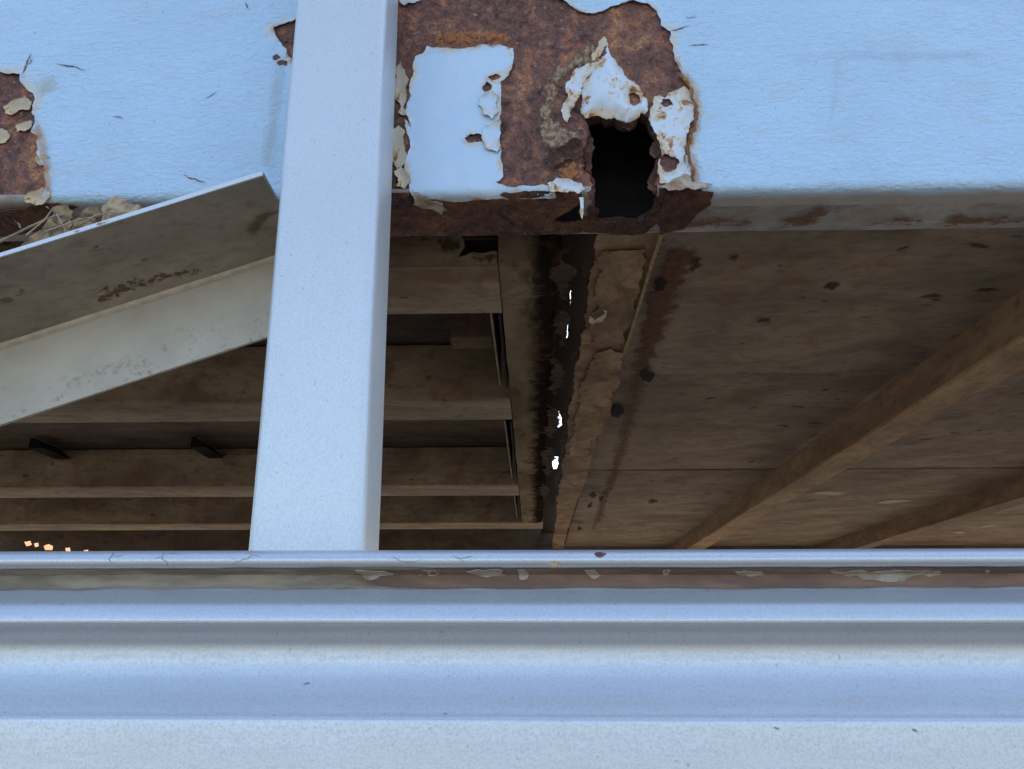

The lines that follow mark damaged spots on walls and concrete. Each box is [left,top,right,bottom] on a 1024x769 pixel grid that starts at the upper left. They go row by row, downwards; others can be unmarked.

rust [0,72,78,237]
peeling [392,44,595,219]
rust [390,0,752,255]
peeling [649,86,712,191]
rust [97,265,217,302]
rust [577,249,702,530]